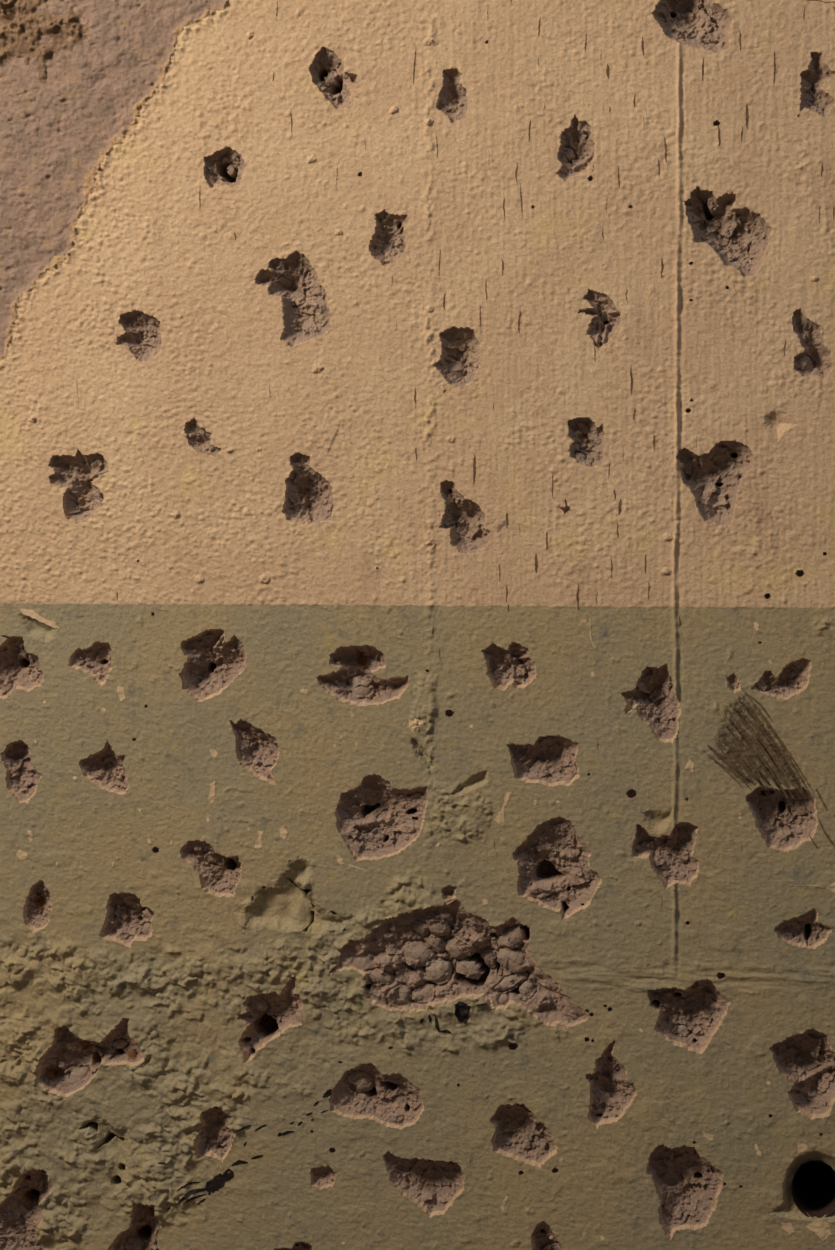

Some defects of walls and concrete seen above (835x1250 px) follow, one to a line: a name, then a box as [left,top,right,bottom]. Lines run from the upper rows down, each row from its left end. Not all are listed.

spalling [652,0,734,54]
spalling [0,0,229,363]
spalling [203,146,246,189]
spalling [683,185,773,278]
spalling [254,250,332,348]
spalling [48,449,109,522]
spalling [676,439,754,527]
spalling [179,628,247,702]
spalling [300,645,409,707]
spalling [335,774,428,864]
spalling [512,816,602,919]
spalling [34,1018,145,1097]